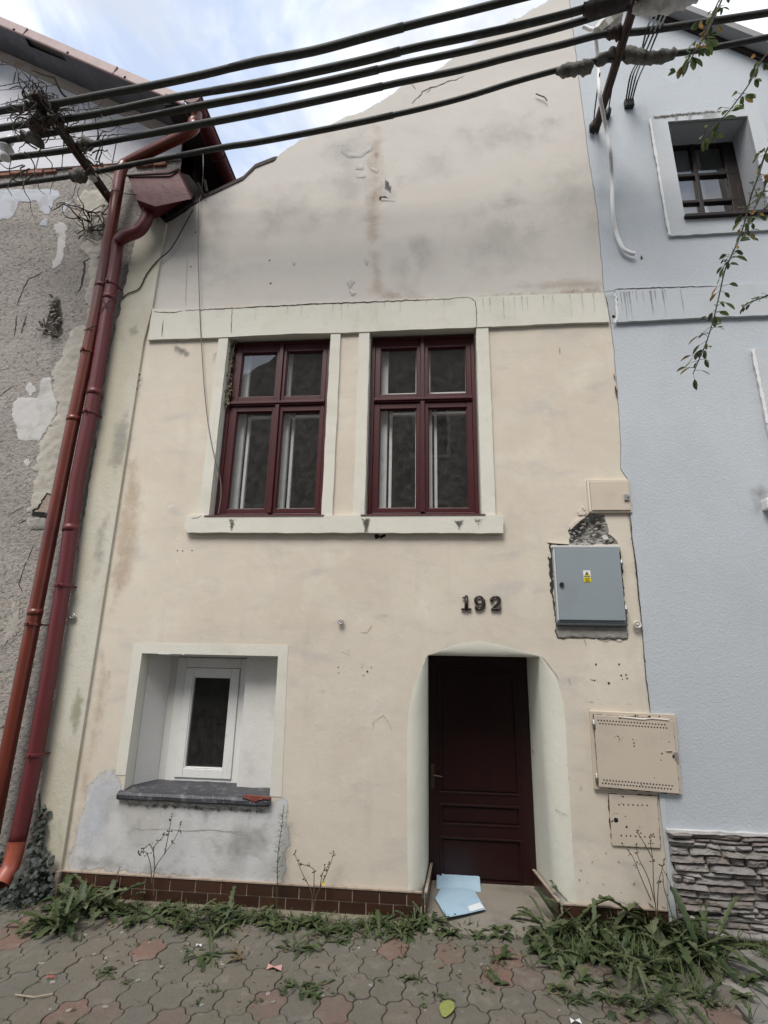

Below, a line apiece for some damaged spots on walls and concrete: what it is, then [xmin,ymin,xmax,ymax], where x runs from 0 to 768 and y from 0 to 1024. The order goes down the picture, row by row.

crack [14,271,43,336]
flaking render [0,188,107,532]
crack [77,258,90,292]
spalling [547,506,627,623]
peeling [68,769,290,883]